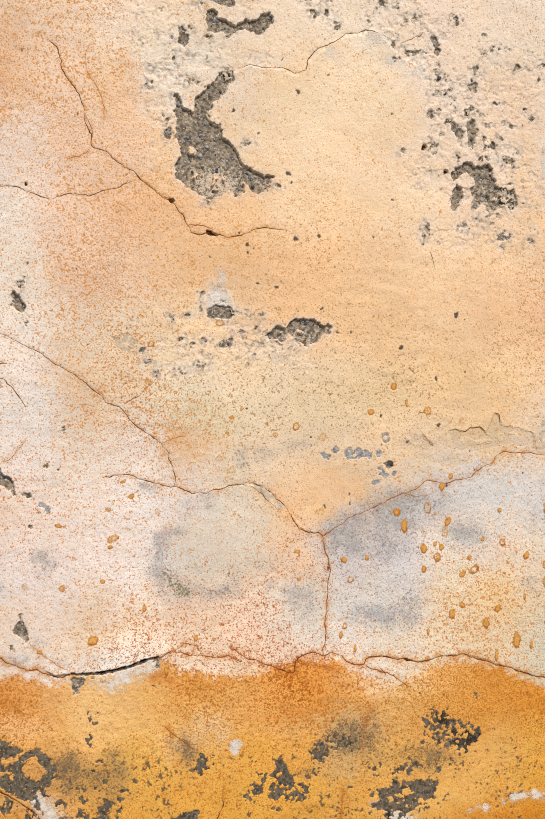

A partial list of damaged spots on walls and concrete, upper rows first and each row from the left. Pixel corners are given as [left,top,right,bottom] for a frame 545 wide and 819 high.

flaking render [169,26,194,65]
flaking render [193,0,273,44]
crack [6,40,283,238]
flaking render [162,68,279,206]
flaking render [391,35,538,231]
flaking render [172,334,213,375]
flaking render [167,291,331,357]
crack [0,334,545,686]
peeling [0,739,138,819]
peeling [170,810,200,819]
peeling [243,733,362,812]
peeling [369,706,481,819]